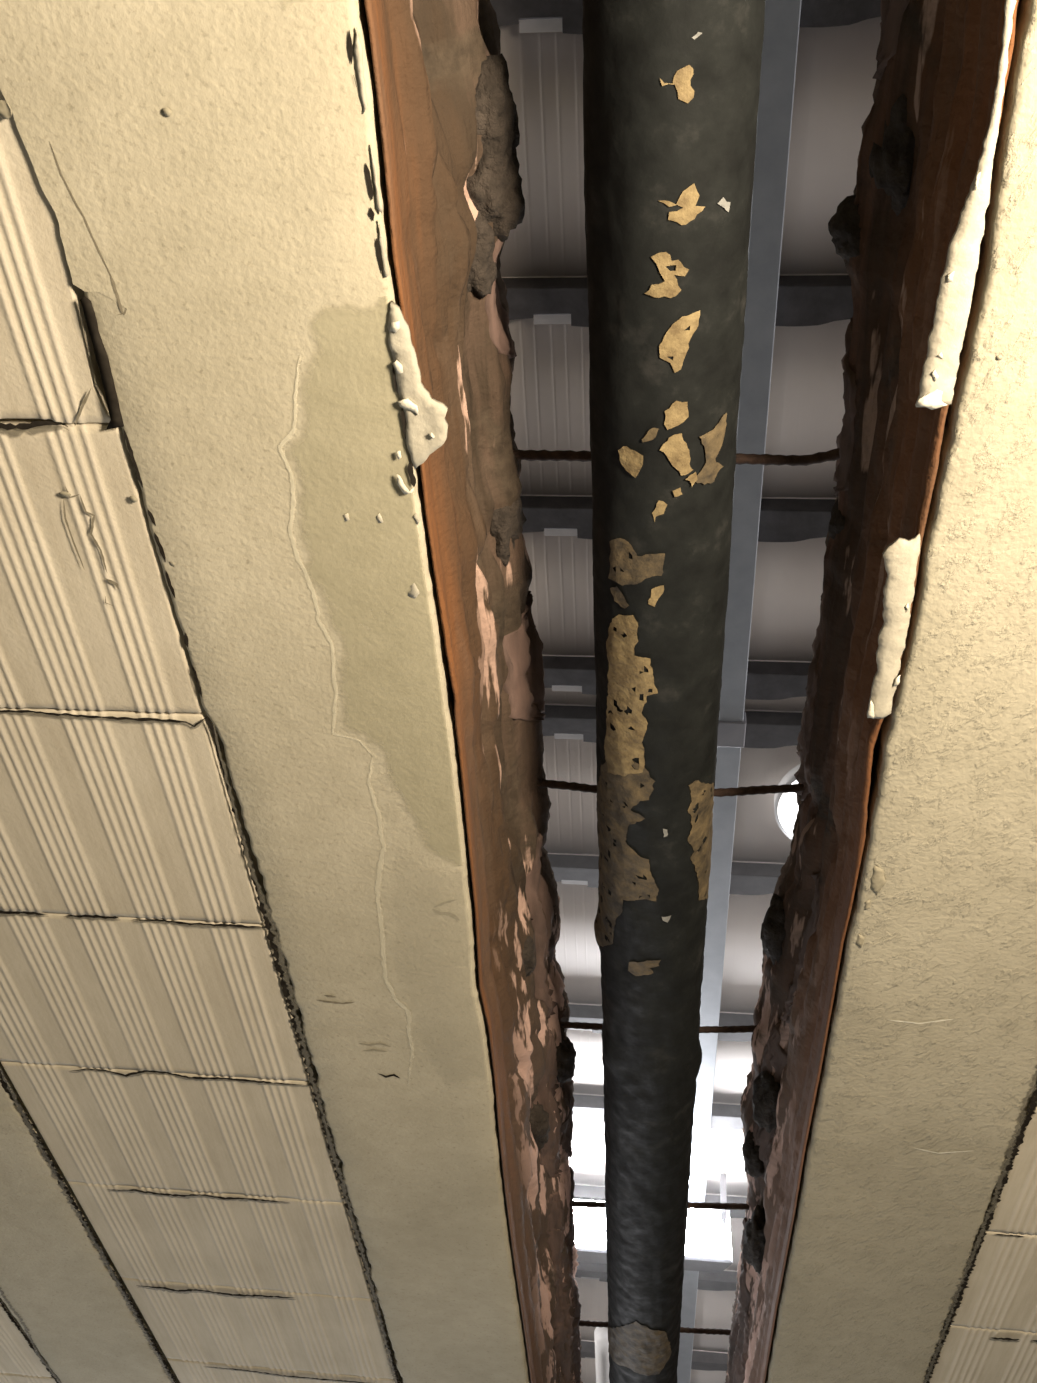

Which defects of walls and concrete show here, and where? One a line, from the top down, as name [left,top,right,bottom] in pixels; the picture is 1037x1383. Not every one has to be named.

flaking render [387,301,448,494]
flaking render [915,0,1016,410]
water stain [278,296,462,1086]